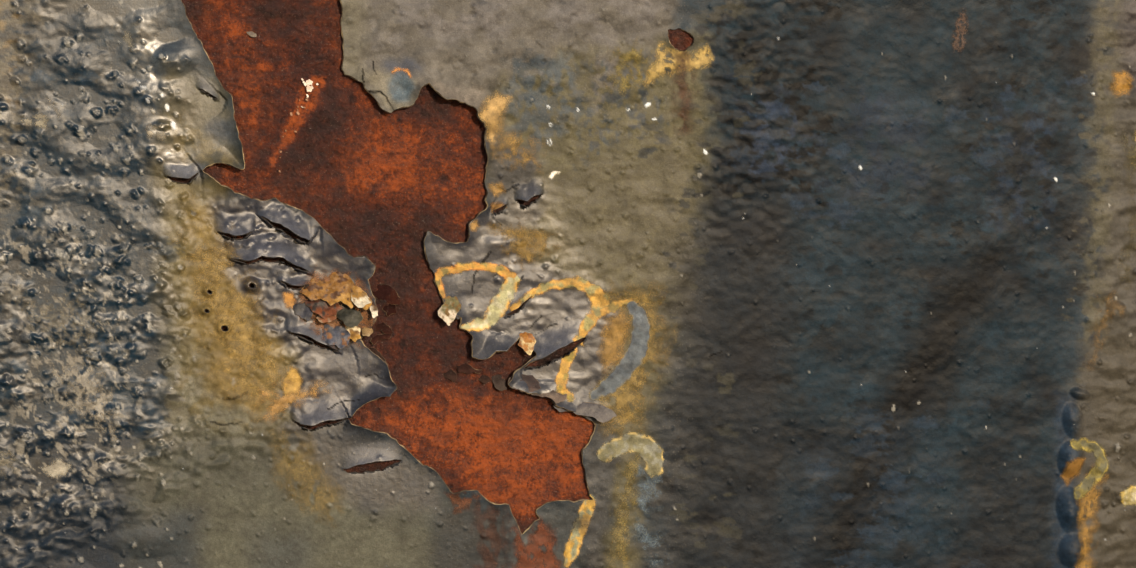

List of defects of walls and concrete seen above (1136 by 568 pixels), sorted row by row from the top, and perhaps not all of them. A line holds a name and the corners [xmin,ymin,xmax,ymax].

leakage [615,46,712,90]
peeling [182,0,617,534]
corrosion [300,273,374,343]
leakage [54,365,116,439]
leakage [42,459,71,477]
leakage [1061,458,1085,485]
corrosion [515,522,560,568]